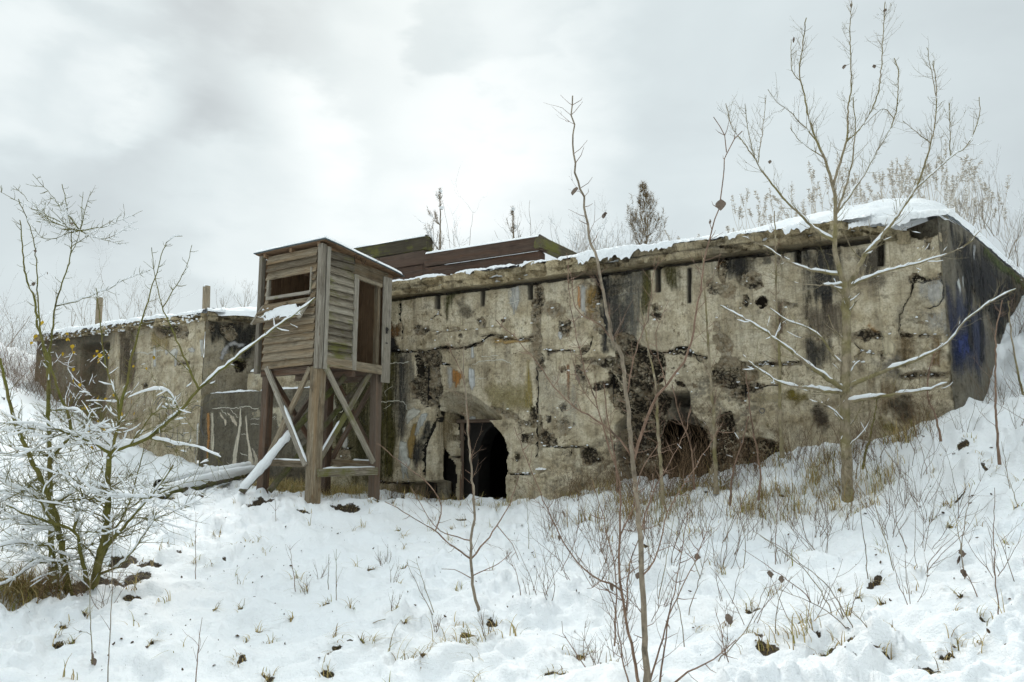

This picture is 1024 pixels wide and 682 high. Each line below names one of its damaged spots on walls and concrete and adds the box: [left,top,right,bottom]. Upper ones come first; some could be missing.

water stain [718,256,750,281]
spalling [704,259,769,309]
water stain [803,245,842,367]
crack [898,278,944,332]
spalling [233,358,247,373]
crack [381,303,592,484]
spalling [409,283,803,480]
crack [655,346,704,362]